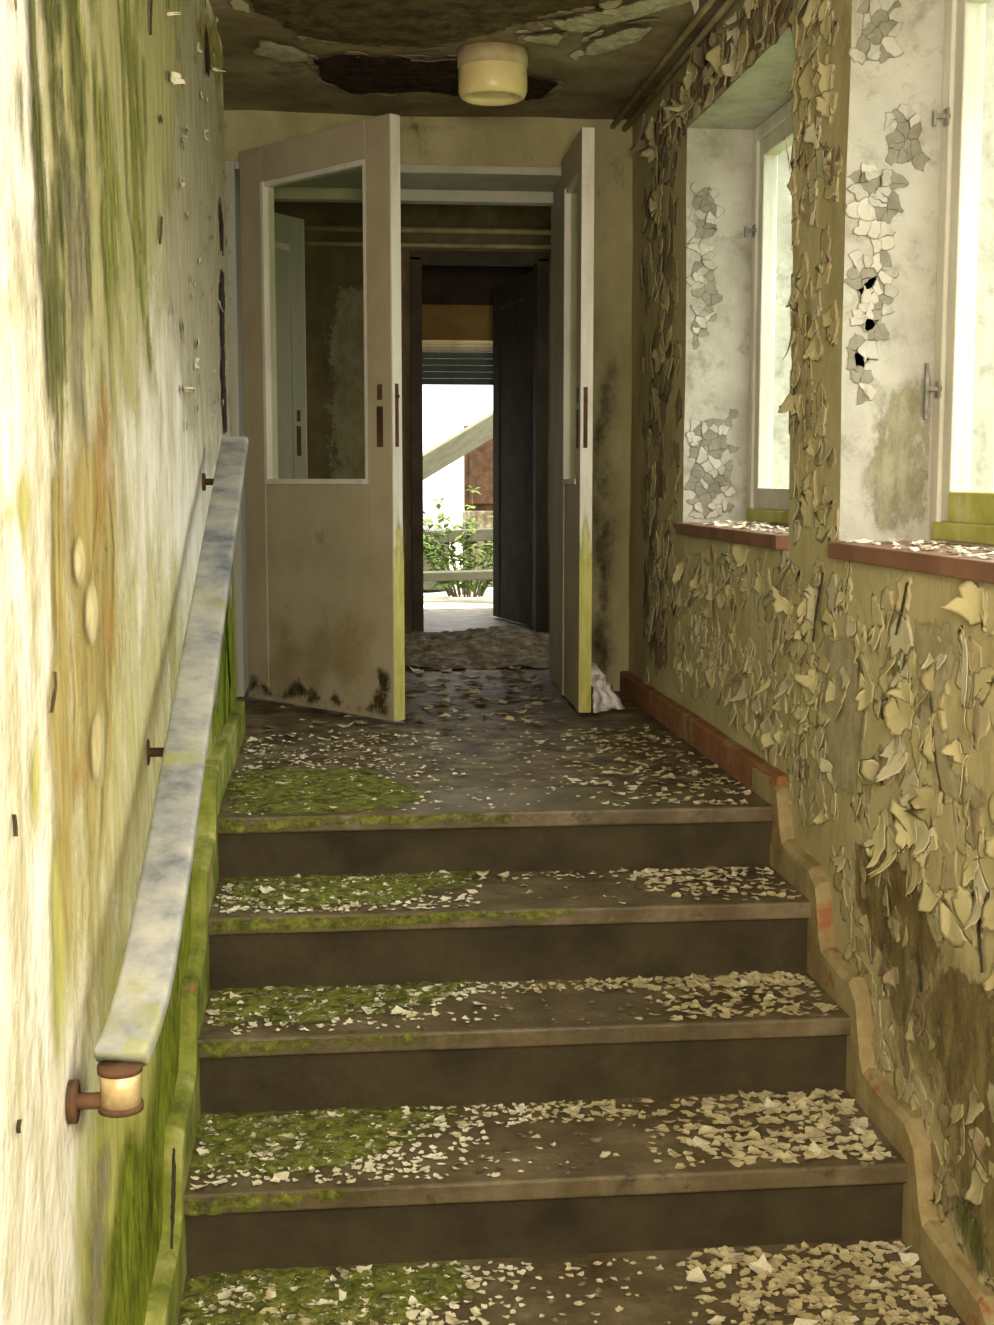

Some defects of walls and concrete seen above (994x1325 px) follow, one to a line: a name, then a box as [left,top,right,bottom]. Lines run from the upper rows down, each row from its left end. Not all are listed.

peeling [167,70,186,86]
peeling [179,0,226,74]
spalling [230,0,699,97]
spalling [523,76,568,101]
peeling [321,283,365,479]
damp [11,475,30,553]
damp [19,0,230,1048]
peeling [630,0,994,1295]
damp [864,862,994,1293]
damp [91,1148,108,1325]